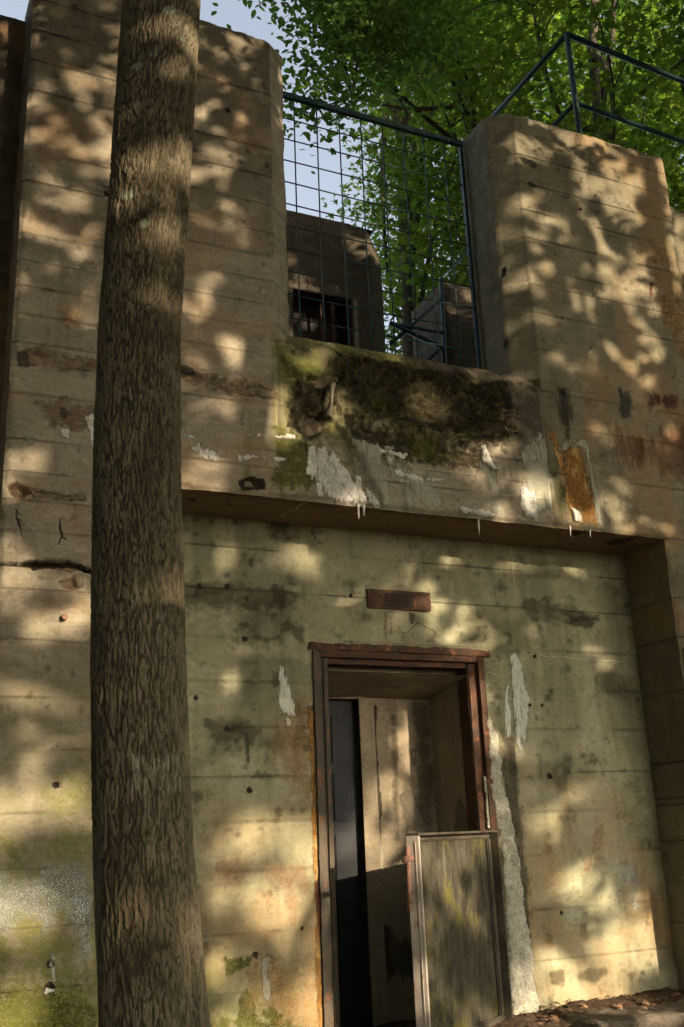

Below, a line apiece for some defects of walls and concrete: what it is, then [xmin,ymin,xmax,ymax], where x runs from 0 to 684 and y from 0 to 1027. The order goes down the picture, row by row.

spalling [17,347,97,376]
spalling [180,350,519,471]
corrosion [648,393,684,409]
spalling [8,481,86,502]
corrosion [548,428,602,526]
spalling [0,560,91,590]
corrosion [307,705,323,1027]